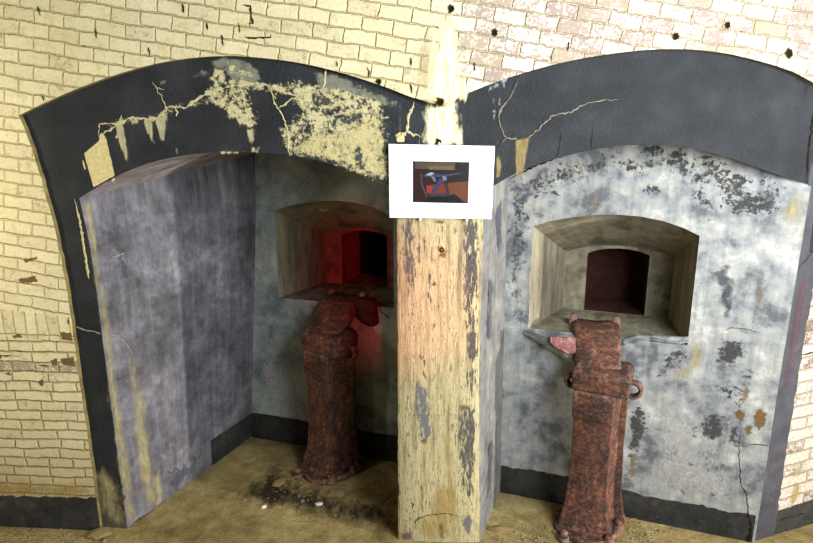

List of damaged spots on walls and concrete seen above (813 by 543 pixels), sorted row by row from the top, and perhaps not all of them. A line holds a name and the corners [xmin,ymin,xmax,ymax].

water stain [424,16,467,145]
crack [498,76,620,179]
peeling [83,133,118,187]
water stain [508,145,785,271]
spalling [51,357,75,366]
water stain [658,348,700,377]
water stain [716,341,745,367]
water stain [716,370,753,408]
rust [734,409,767,434]
crack [738,428,768,542]